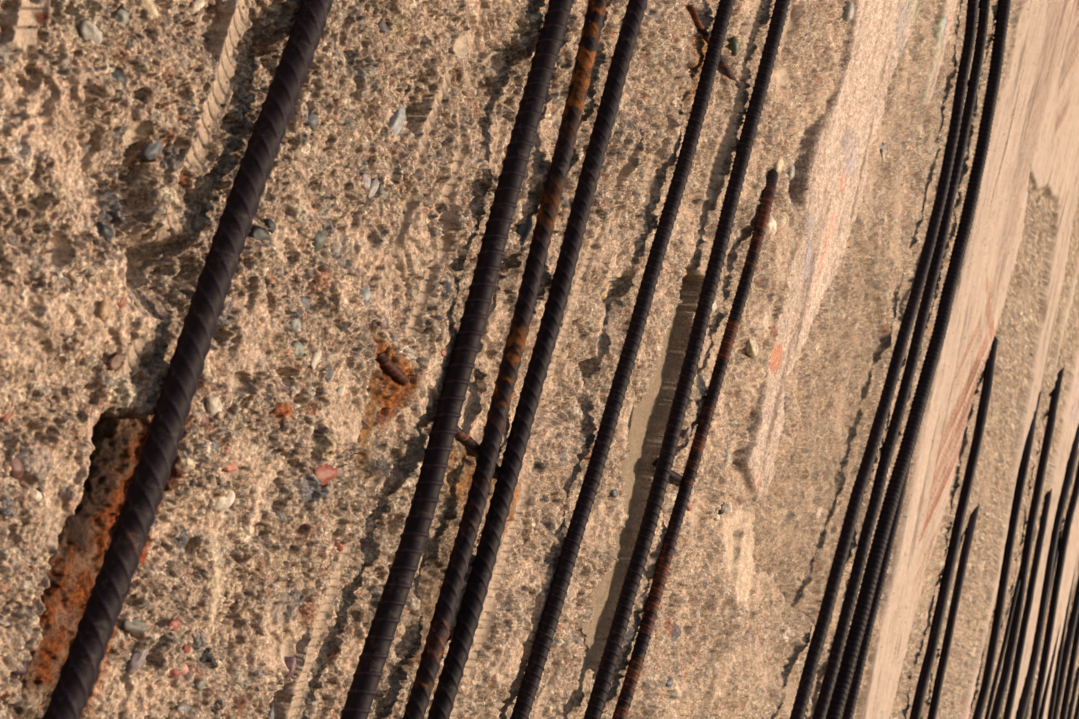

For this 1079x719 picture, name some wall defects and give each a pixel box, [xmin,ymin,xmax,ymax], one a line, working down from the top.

rust [18,410,156,687]
rust [156,458,180,513]
spalling [0,0,608,719]
rust [361,339,418,446]
rust [449,451,476,507]
spalling [427,0,1022,719]